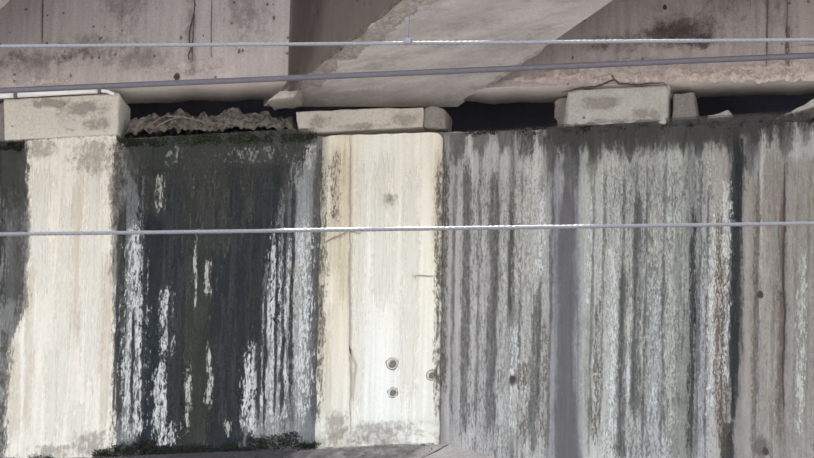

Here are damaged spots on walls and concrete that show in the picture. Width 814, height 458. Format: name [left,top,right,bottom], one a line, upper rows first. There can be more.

crack [188,0,196,72]
spalling [268,0,438,110]
damp [0,97,342,458]
damp [432,156,451,414]
damp [460,166,472,430]
damp [485,132,761,458]
damp [774,183,809,439]